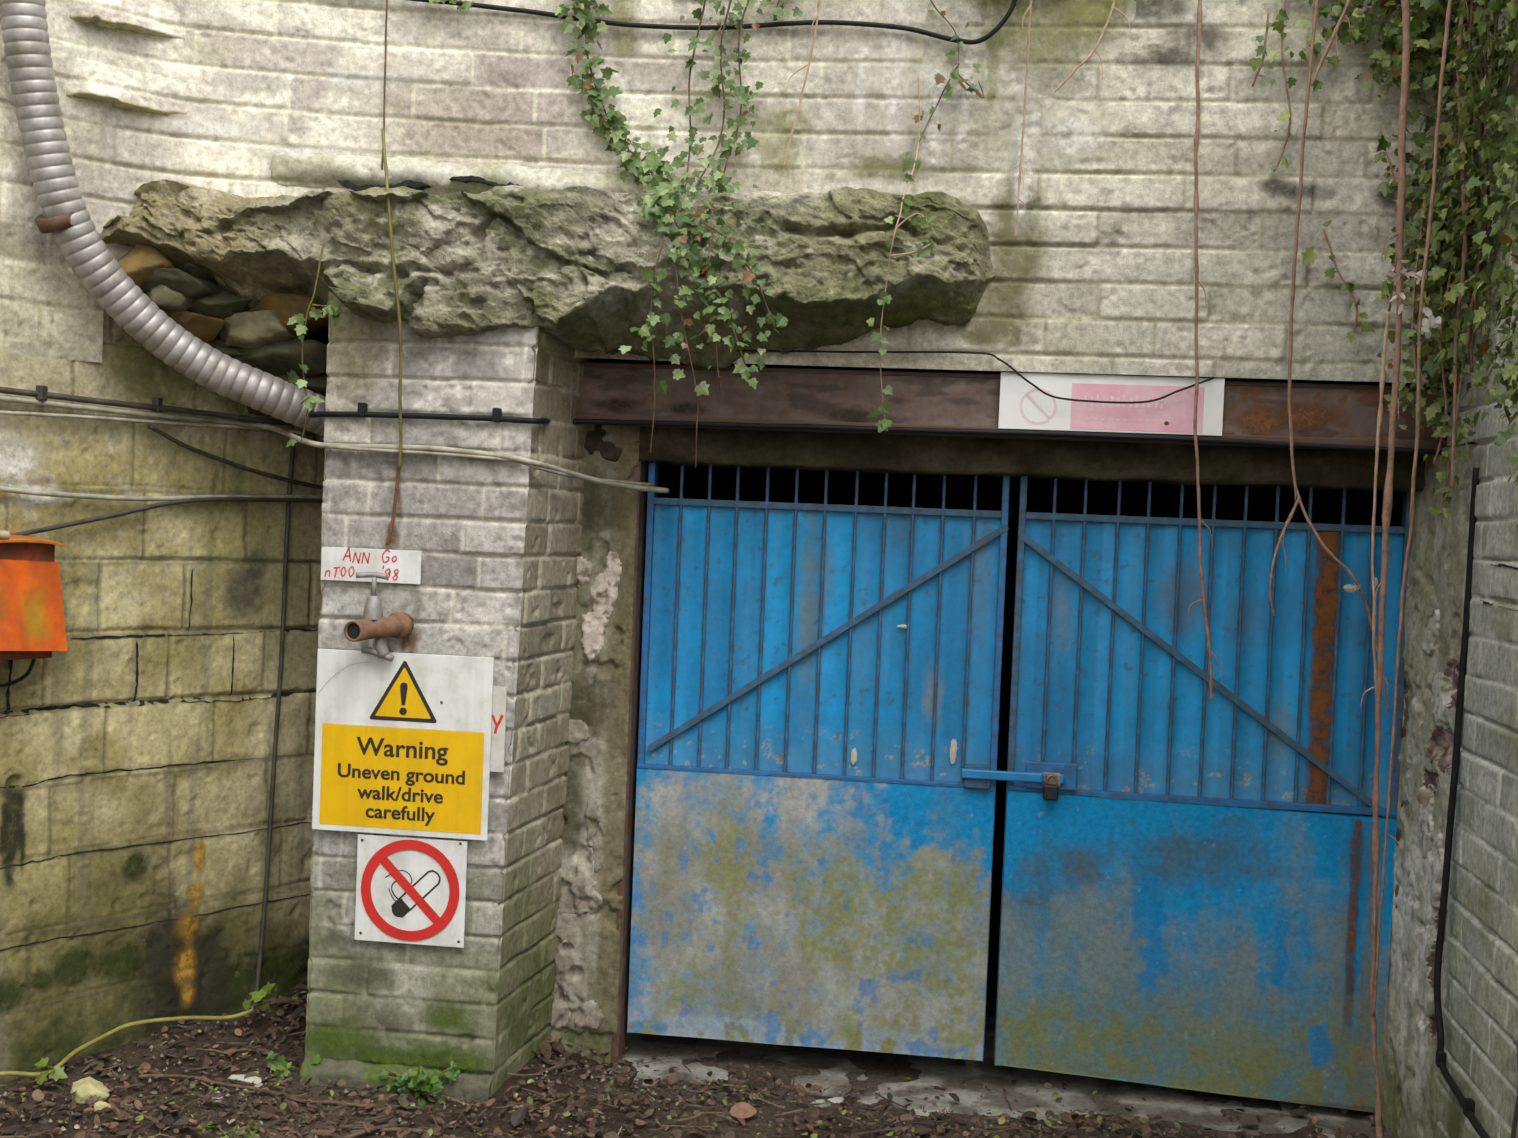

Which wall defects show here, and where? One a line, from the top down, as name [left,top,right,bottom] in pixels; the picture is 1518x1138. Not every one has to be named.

flaking render [575,552,622,661]
flaking render [567,719,590,744]
damp [0,789,25,885]
flaking render [559,794,603,915]
flaking render [1418,609,1459,987]
damp [142,896,309,1036]
damp [333,934,390,986]
flaking render [549,940,604,1029]